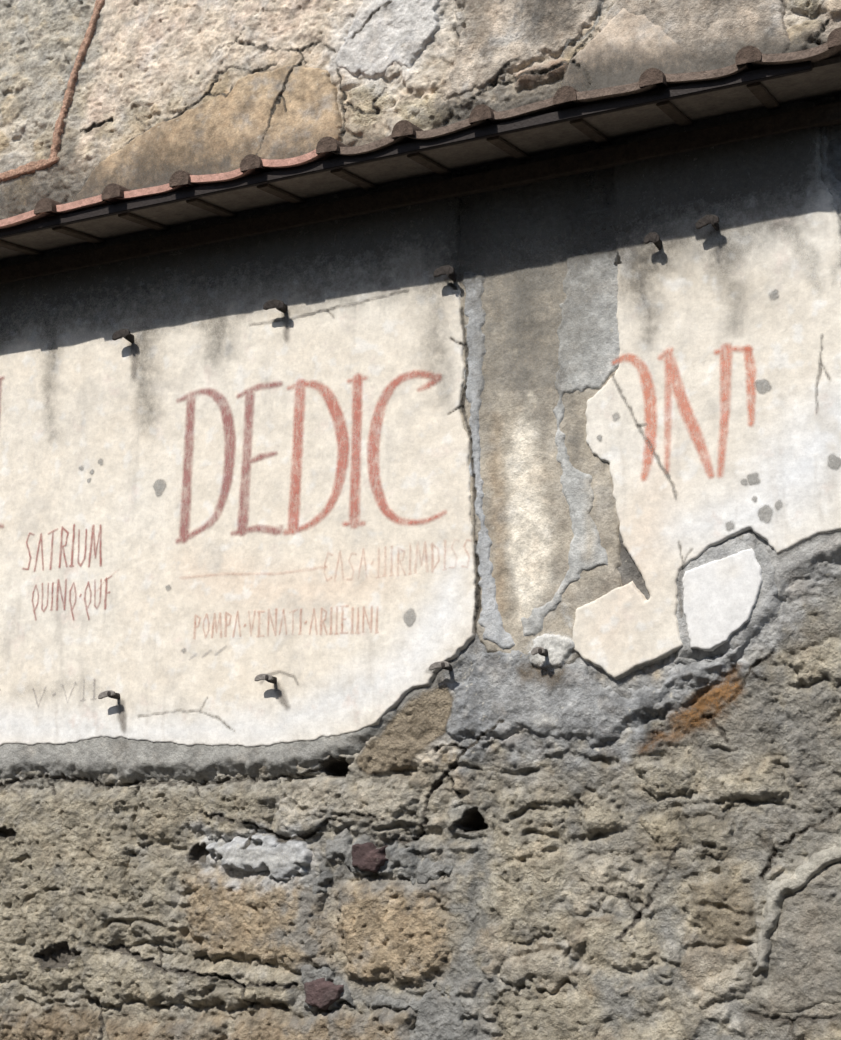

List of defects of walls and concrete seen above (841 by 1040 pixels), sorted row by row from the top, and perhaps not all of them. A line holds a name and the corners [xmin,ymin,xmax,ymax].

crack [80,1,392,155]
crack [443,0,604,127]
damp [445,32,828,125]
damp [0,97,832,379]
crack [613,376,677,498]
peeling [682,522,762,651]
peeling [616,654,676,679]
corrosion [644,670,740,748]